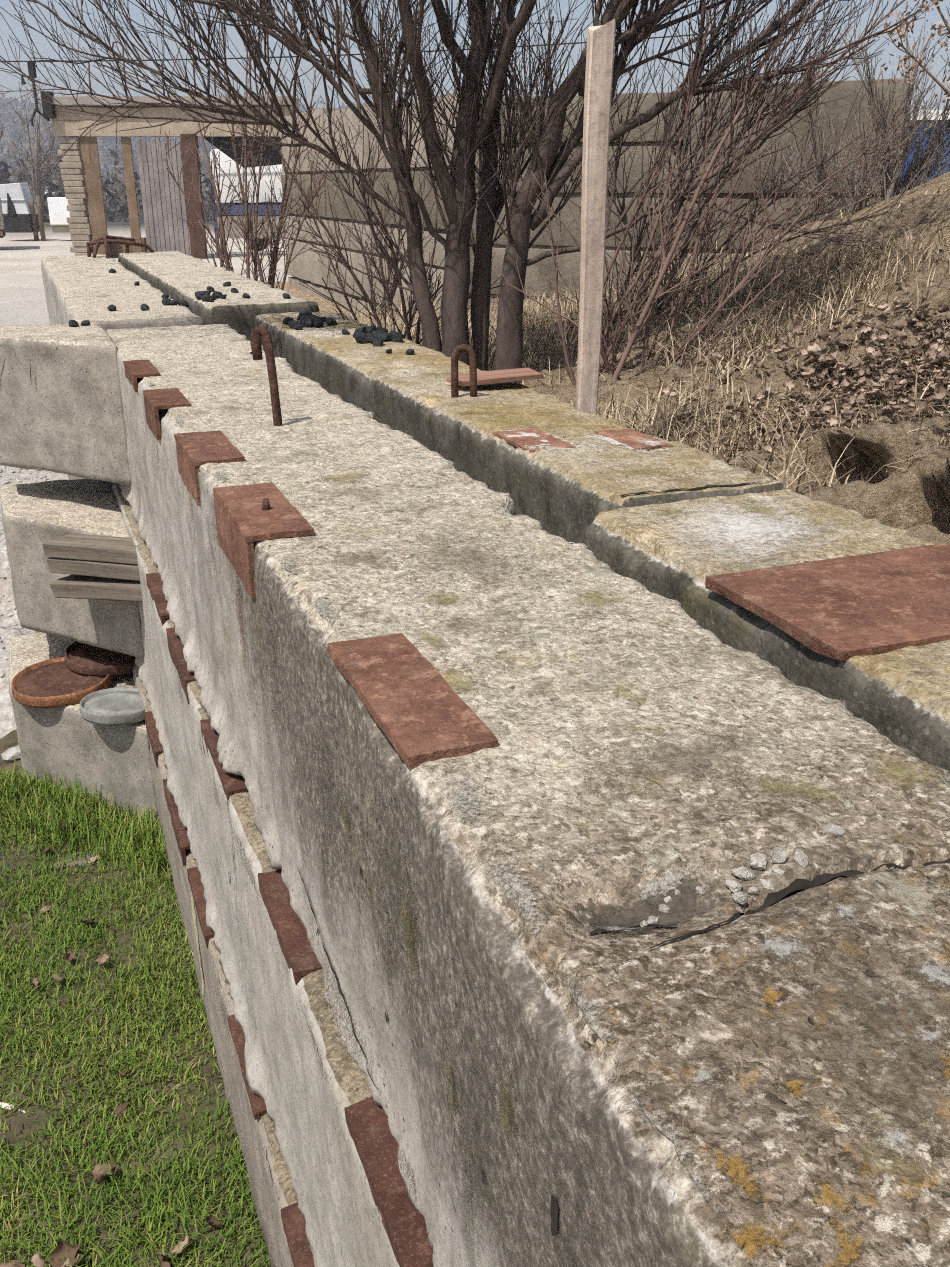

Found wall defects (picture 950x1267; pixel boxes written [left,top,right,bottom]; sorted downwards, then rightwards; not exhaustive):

spalling [486,858,726,935]
crack [589,858,950,948]